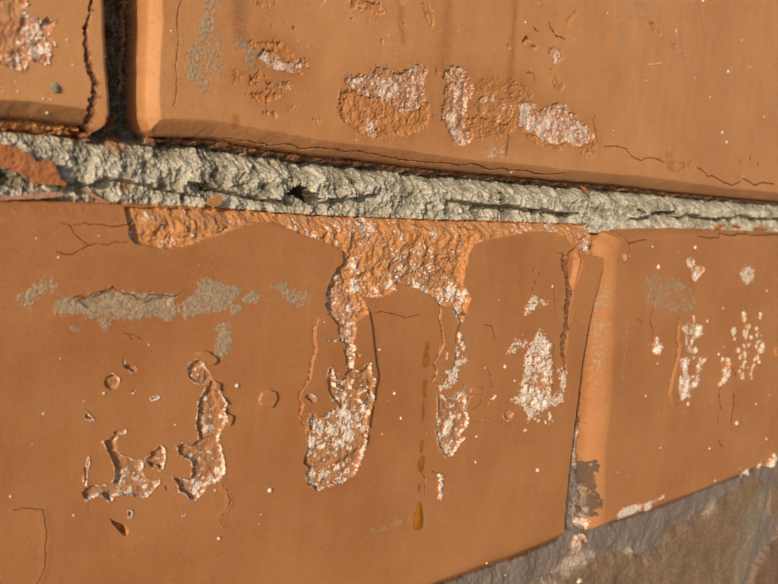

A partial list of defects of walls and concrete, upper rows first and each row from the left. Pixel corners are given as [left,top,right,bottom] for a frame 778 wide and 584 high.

crack [44,0,100,142]
crack [173,2,181,105]
spalling [336,46,600,159]
crack [697,167,775,186]
crack [57,220,134,256]
spalling [81,359,233,503]
spalling [124,195,604,491]
efflorescence [506,325,567,432]
crack [552,252,573,390]
efflorescence [678,315,708,406]
efflorescence [718,312,765,387]
crack [14,507,48,584]